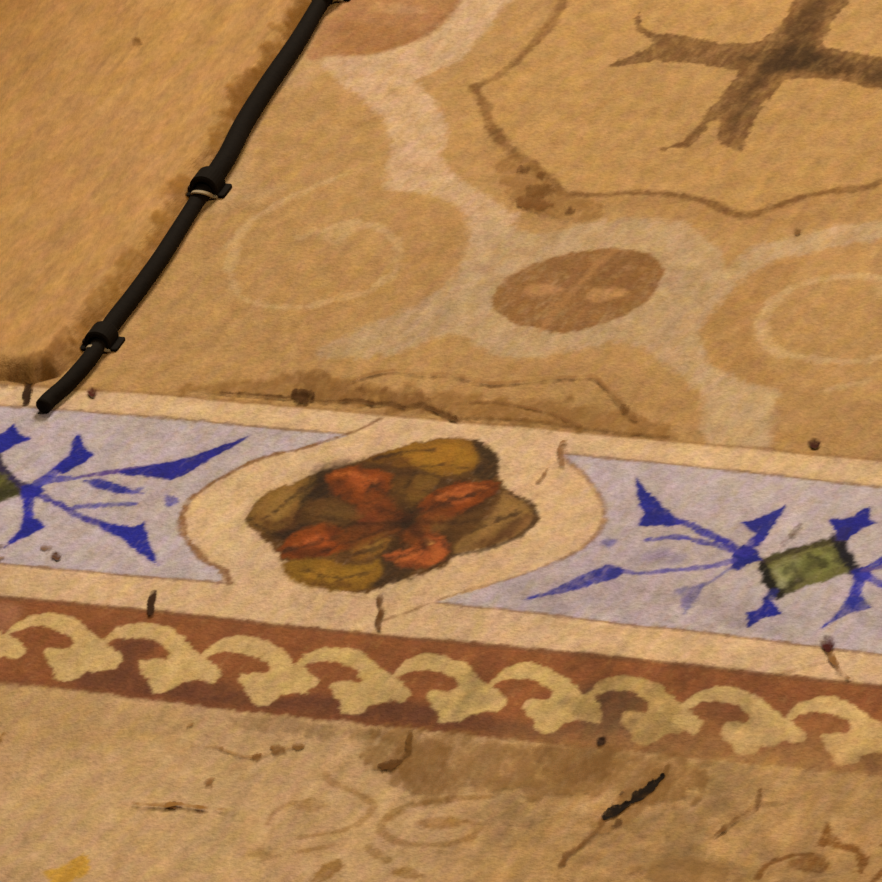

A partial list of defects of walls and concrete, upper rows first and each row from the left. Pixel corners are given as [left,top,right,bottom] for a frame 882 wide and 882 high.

crack [559,764,669,867]